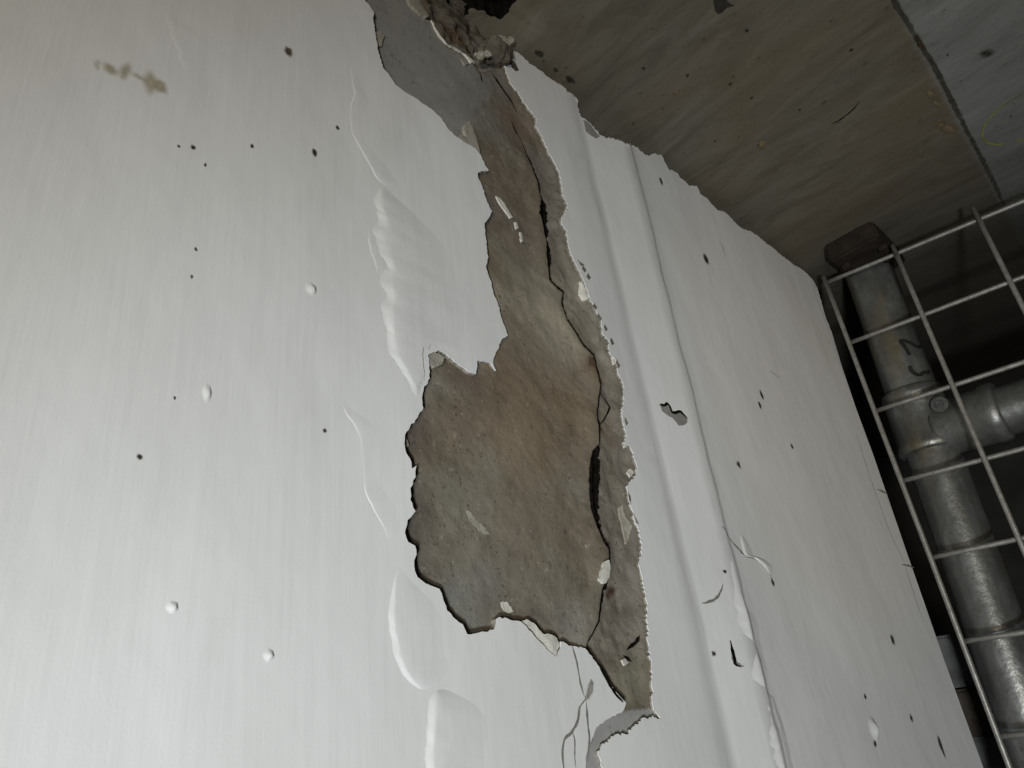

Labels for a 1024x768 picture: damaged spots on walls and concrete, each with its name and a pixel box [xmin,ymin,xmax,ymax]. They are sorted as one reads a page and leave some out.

flaking render [365,0,657,768]
crack [480,74,623,768]
crack [623,636,640,662]
peeling [659,402,687,426]